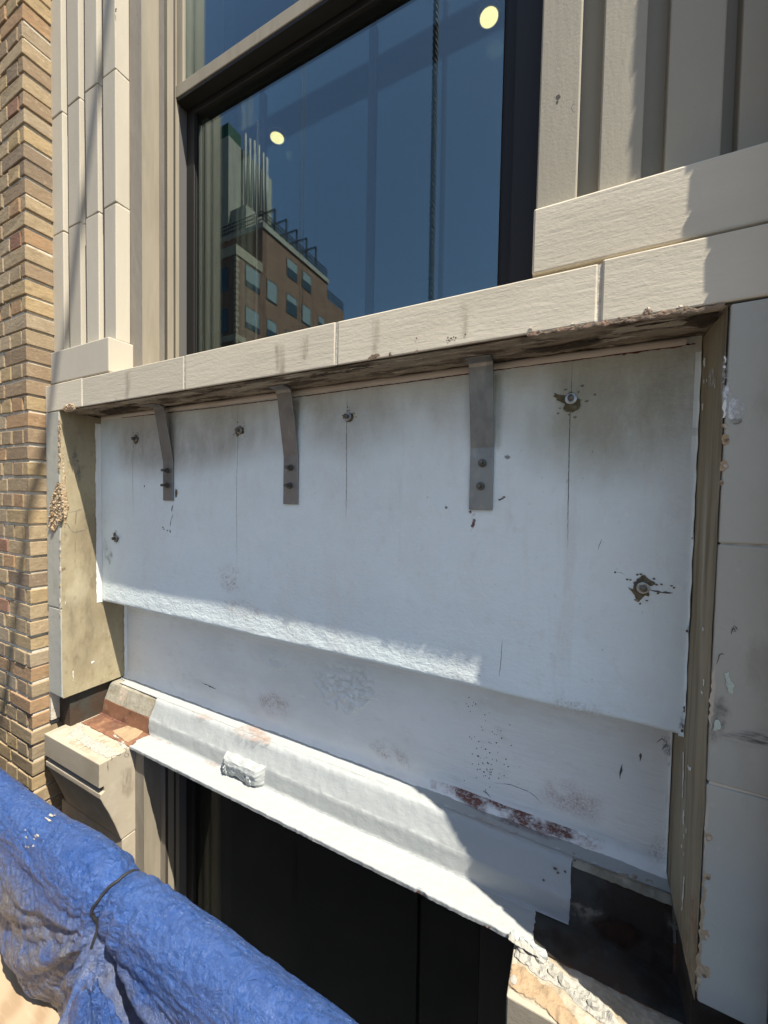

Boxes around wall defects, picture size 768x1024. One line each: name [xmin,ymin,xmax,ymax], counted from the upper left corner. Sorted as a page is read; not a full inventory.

peeling [521,303,725,354]
spalling [47,403,75,631]
corrosion [100,713,143,742]
corrosion [456,788,587,838]